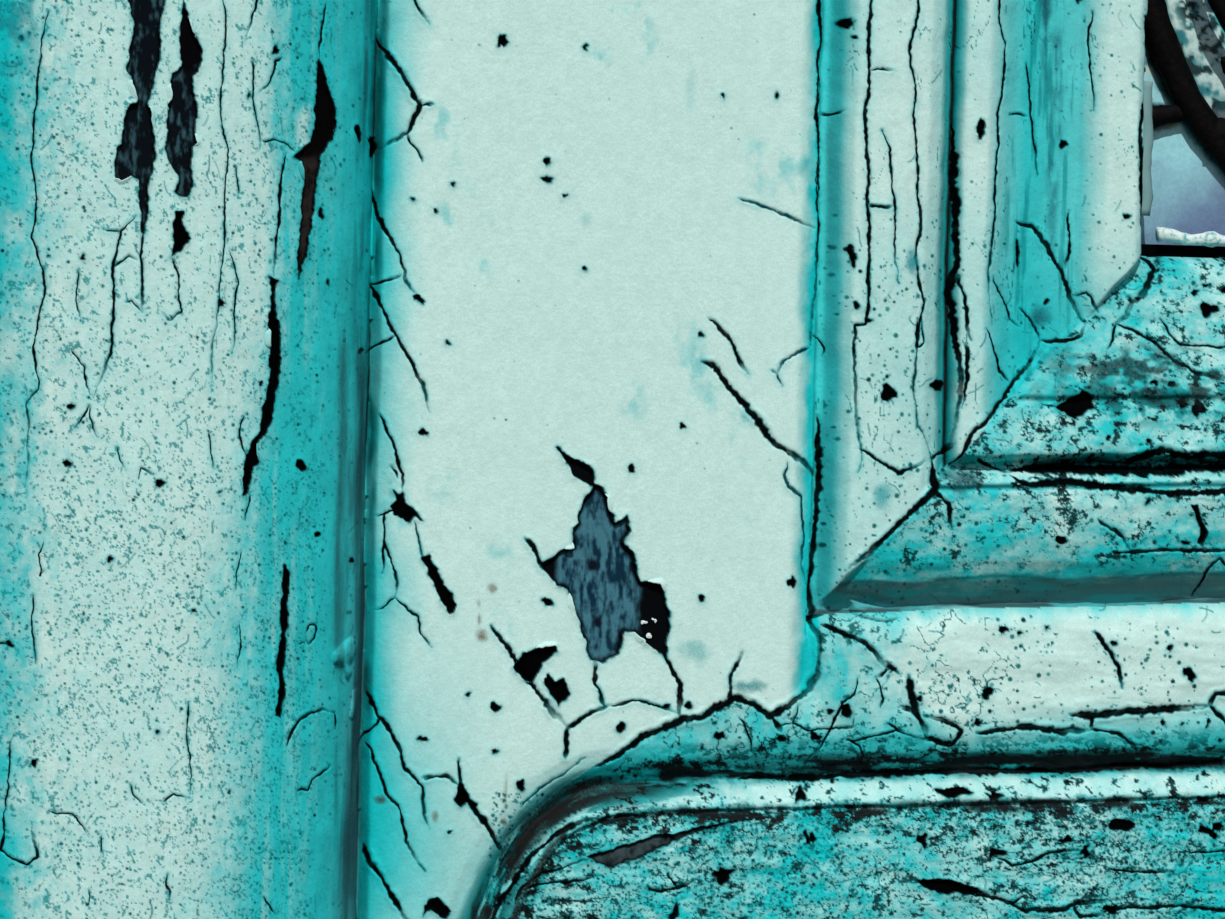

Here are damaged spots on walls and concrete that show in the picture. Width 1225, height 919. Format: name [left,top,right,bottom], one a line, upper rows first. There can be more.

peeling [113,0,202,257]
peeling [294,59,337,279]
crack [372,38,430,158]
crack [741,0,1225,556]
spalling [1056,391,1094,418]
peeling [541,447,670,663]
crack [491,319,1225,806]
spalling [513,641,570,705]
crack [287,691,590,919]